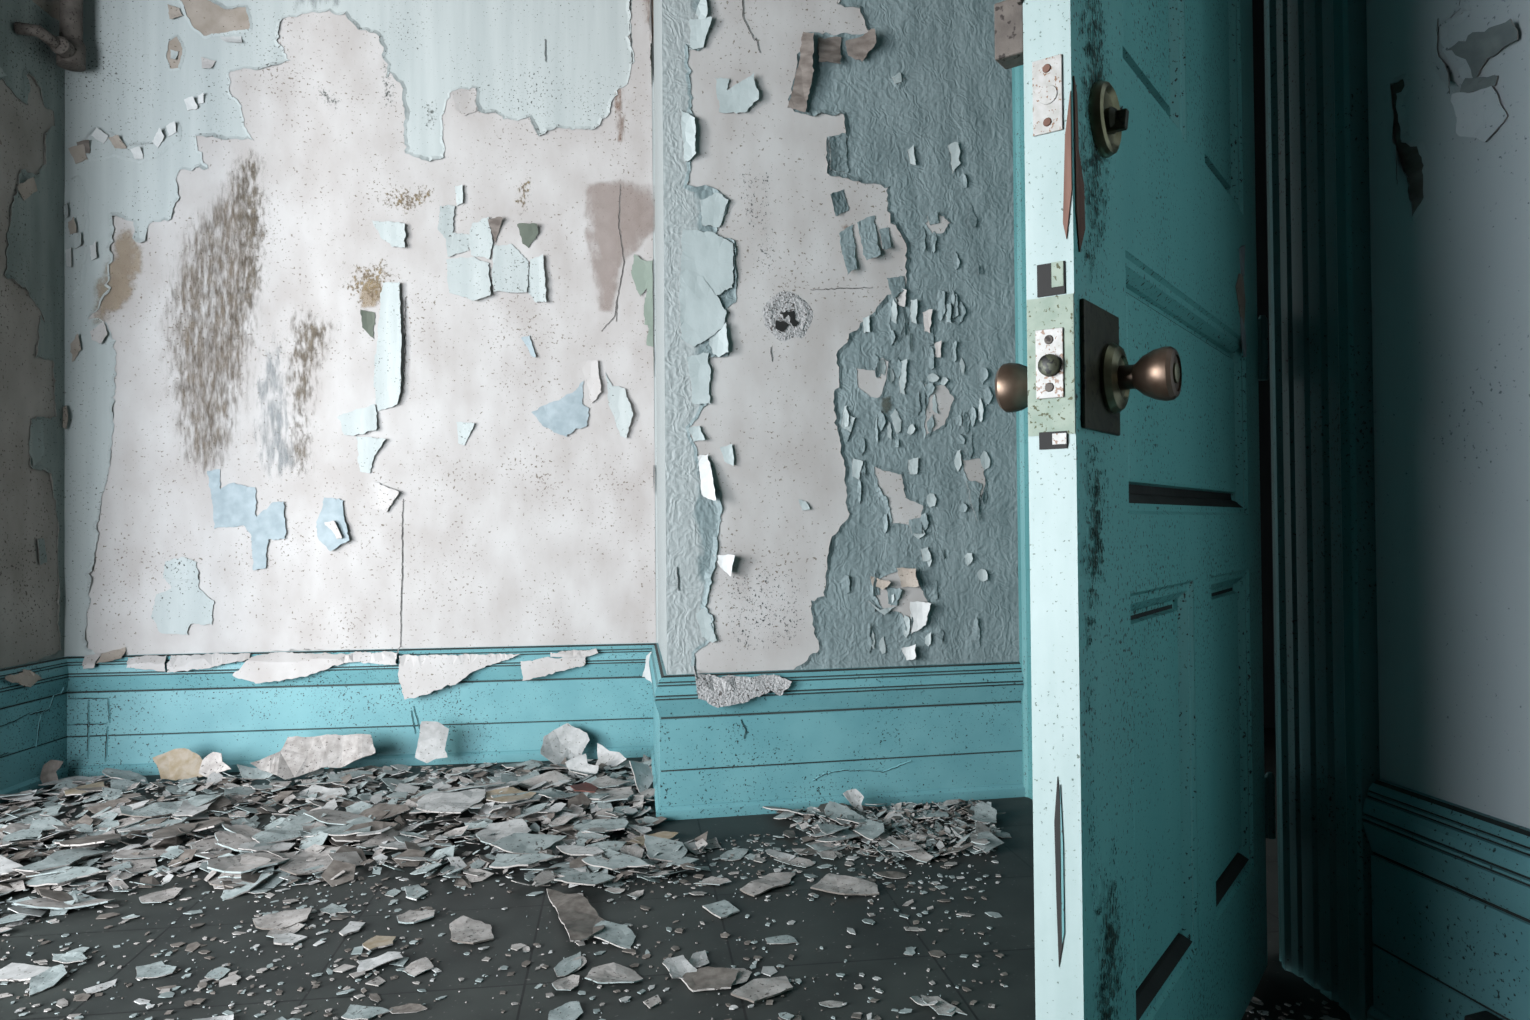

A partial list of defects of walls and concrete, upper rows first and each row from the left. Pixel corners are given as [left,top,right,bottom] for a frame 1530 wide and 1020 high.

leakage [174,161,265,464]
leakage [271,324,326,465]
peeling [0,0,656,700]
peeling [679,0,993,708]